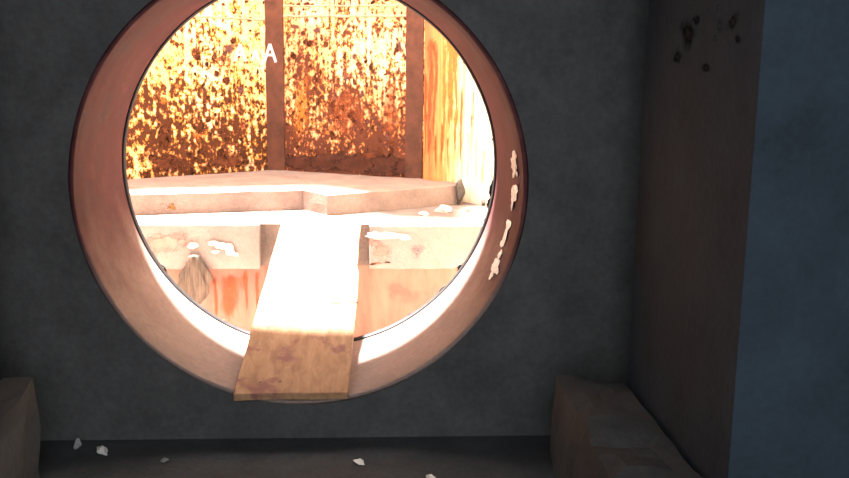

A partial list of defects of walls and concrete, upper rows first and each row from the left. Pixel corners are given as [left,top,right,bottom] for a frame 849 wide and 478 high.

corrosion [143,22,266,178]
corrosion [285,0,406,177]
corrosion [425,40,475,164]
peeling [146,234,239,256]
spalling [366,231,411,257]
peeling [488,150,518,280]